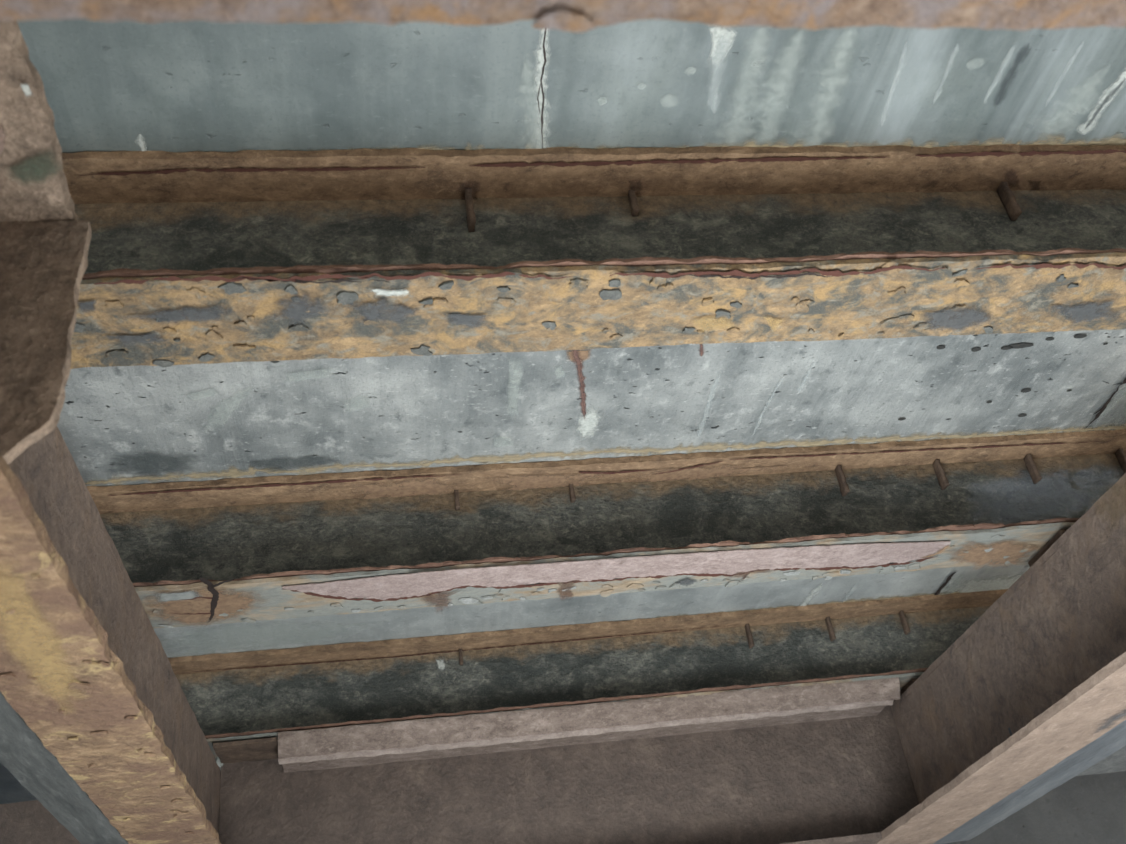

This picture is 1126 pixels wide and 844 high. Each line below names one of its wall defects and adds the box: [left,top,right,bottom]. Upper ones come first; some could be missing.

corrosion [532,9,597,33]
damp [996,46,1028,104]
crack [473,29,887,167]
damp [1080,72,1126,134]
crack [78,167,425,176]
crack [915,149,1126,157]
corrosion [974,137,1126,146]
corrosion [568,350,598,436]
crack [578,378,1126,475]
crack [109,474,461,496]
crack [174,578,236,622]